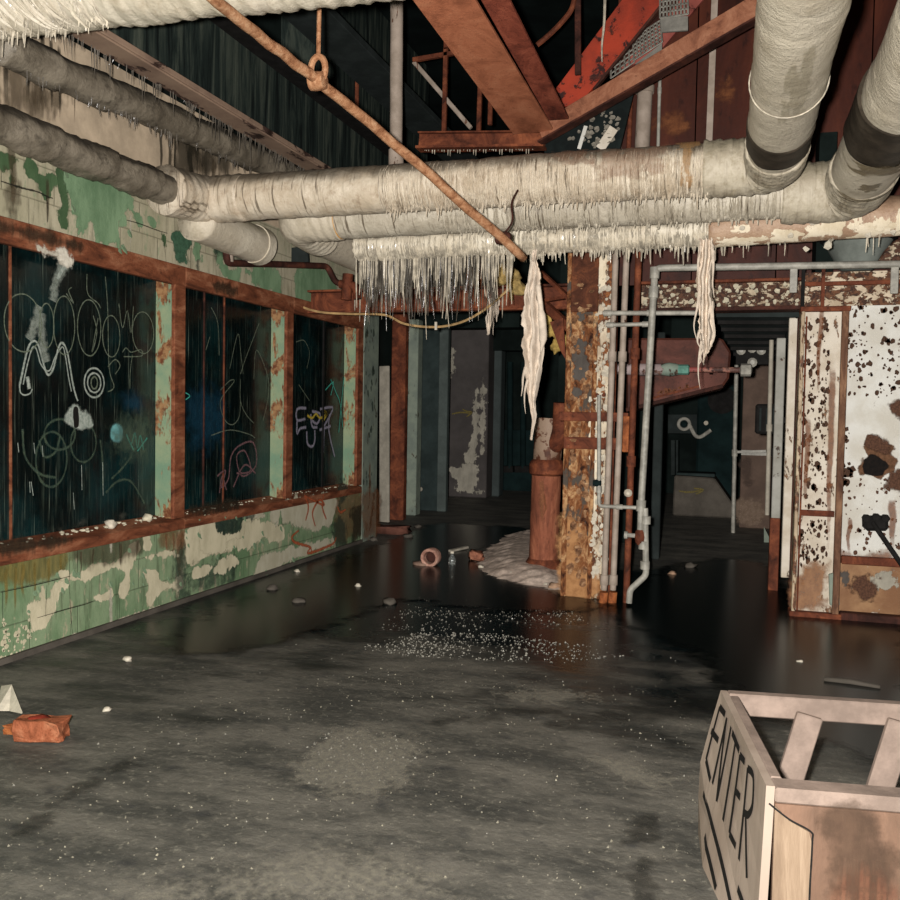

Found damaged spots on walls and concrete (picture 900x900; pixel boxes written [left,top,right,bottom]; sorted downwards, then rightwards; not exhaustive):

peeling [0,151,166,254]
peeling [213,249,283,293]
peeling [294,268,337,302]
peeling [448,384,487,494]
corrosion [789,314,835,610]
peeling [0,492,338,658]
corrosion [557,518,600,598]
peeling [840,571,899,601]